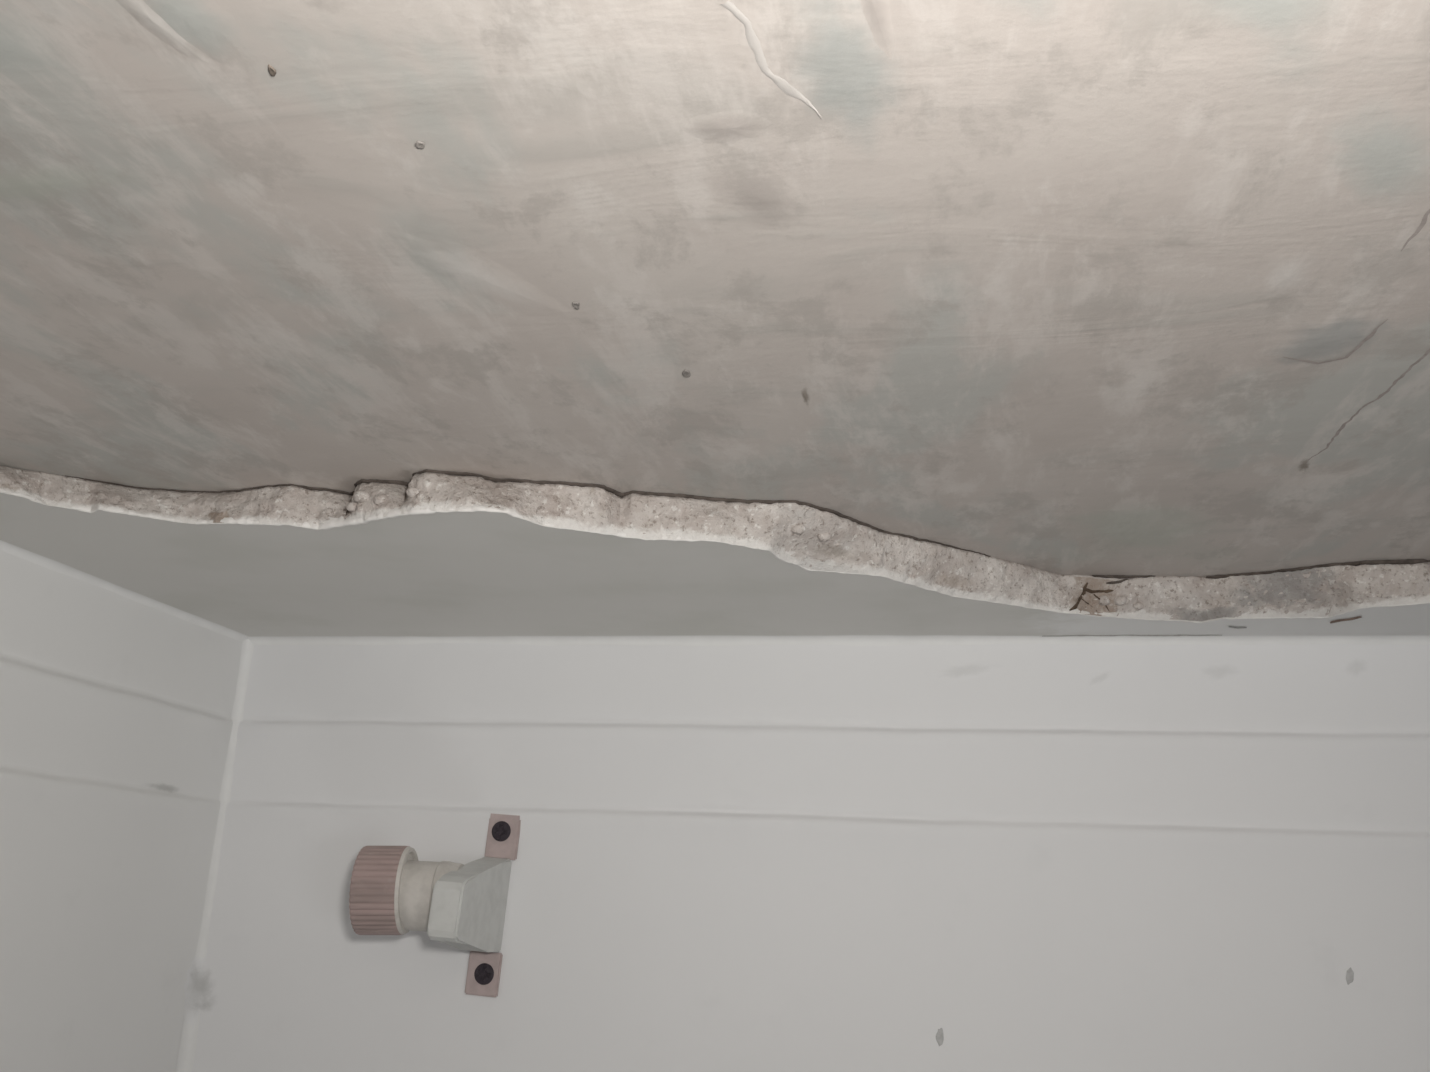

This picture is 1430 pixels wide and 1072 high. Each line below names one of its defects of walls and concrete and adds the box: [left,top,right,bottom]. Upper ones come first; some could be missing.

crack [1401,209,1430,251]
crack [1308,349,1430,460]
spalling [0,466,1430,637]